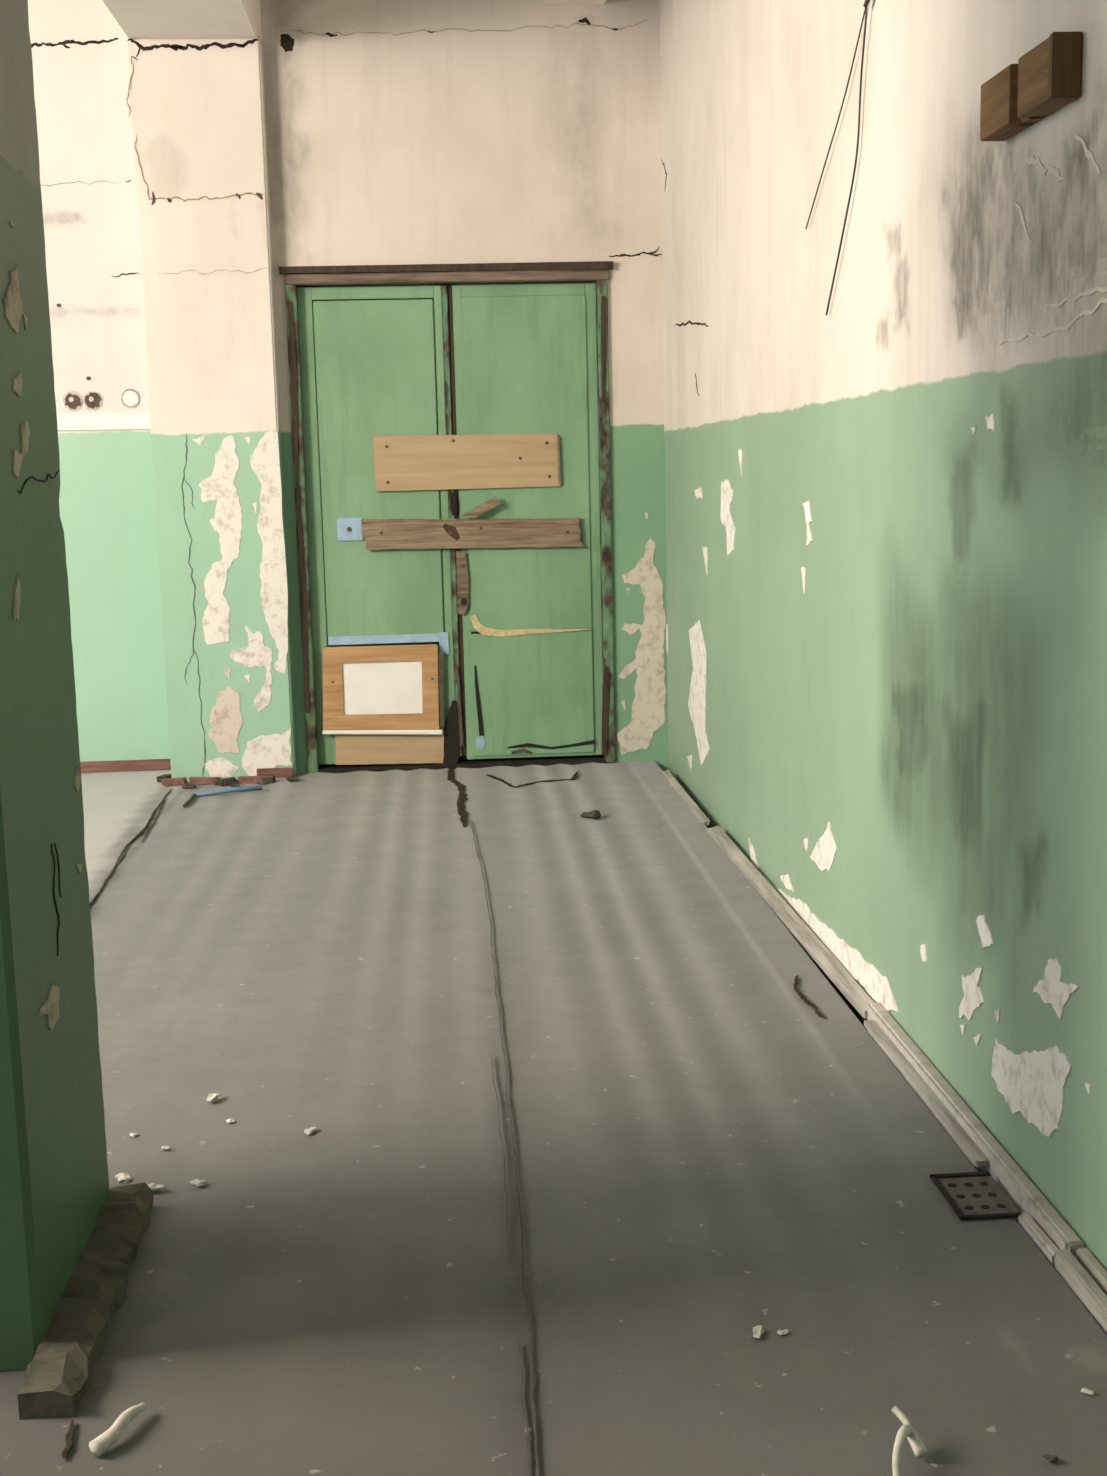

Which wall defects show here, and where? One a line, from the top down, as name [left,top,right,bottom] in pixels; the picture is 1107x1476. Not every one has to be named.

crack [31,17,649,205]
peeling [12,421,30,479]
crack [51,436,206,956]
peeling [193,301,310,777]
peeling [602,539,668,755]
peeling [687,620,710,768]
crack [447,767,578,1476]
peeling [803,822,837,872]
peeling [749,837,899,1012]
peeling [959,915,1092,1137]